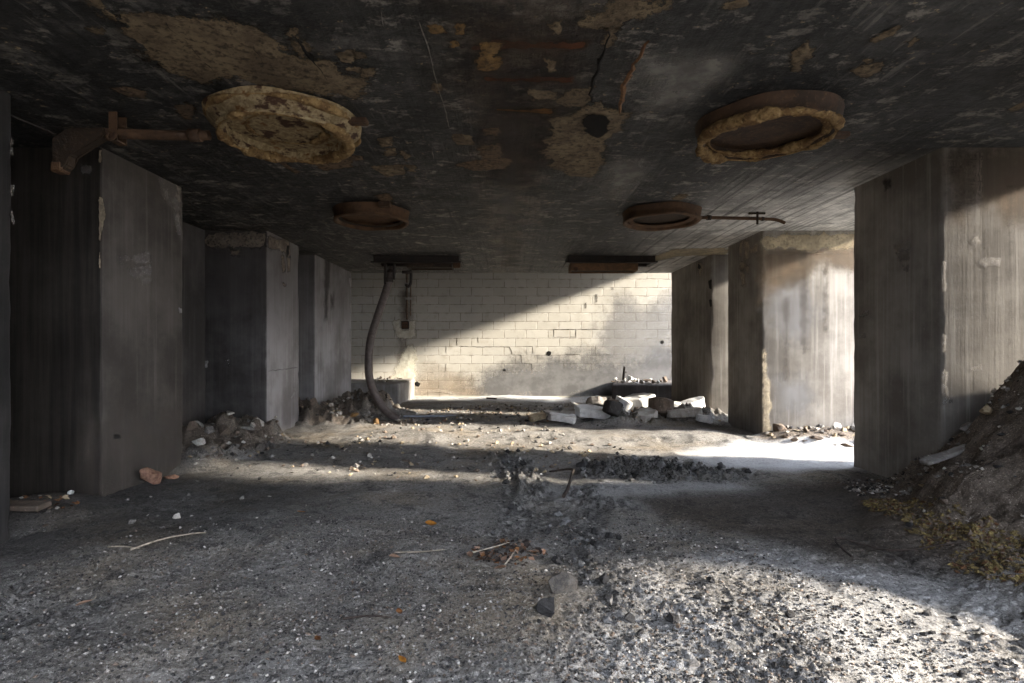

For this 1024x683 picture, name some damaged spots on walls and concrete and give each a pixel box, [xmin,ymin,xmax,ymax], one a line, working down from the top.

flaking render [83,0,377,100]
flaking render [473,41,504,72]
corrosion [457,25,569,182]
flaking render [526,85,633,179]
crack [588,31,650,114]
flaking render [205,230,268,257]
flaking render [760,231,854,252]